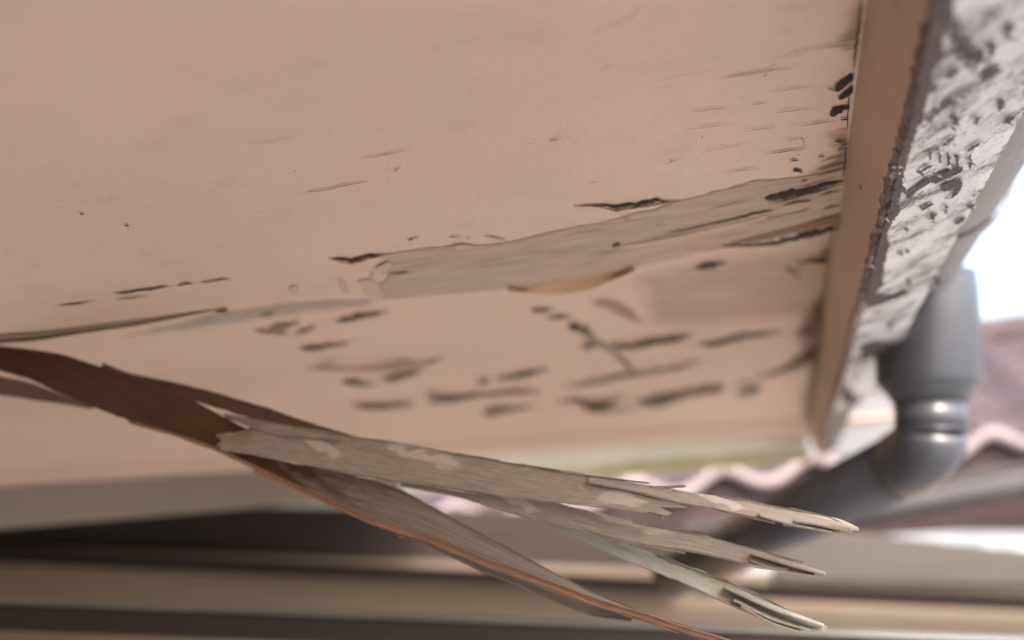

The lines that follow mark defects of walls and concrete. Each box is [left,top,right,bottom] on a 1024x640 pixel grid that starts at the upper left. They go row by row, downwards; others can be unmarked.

peeling [865,0,1018,308]
peeling [378,169,846,299]
crack [342,308,820,417]
peeling [860,341,903,360]